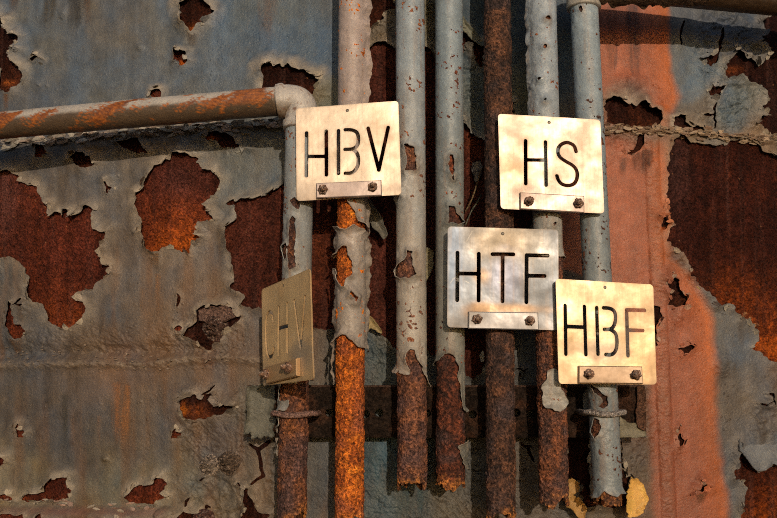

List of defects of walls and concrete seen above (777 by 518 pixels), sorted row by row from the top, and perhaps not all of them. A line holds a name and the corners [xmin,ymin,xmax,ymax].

peeling [0,0,486,413]
peeling [570,3,777,376]
peeling [0,413,200,518]
peeling [164,384,247,448]
peeling [226,472,277,518]
peeling [275,384,289,456]
peeling [458,440,470,470]
peeling [566,384,649,518]
rust [635,386,647,431]
peeling [686,429,777,518]